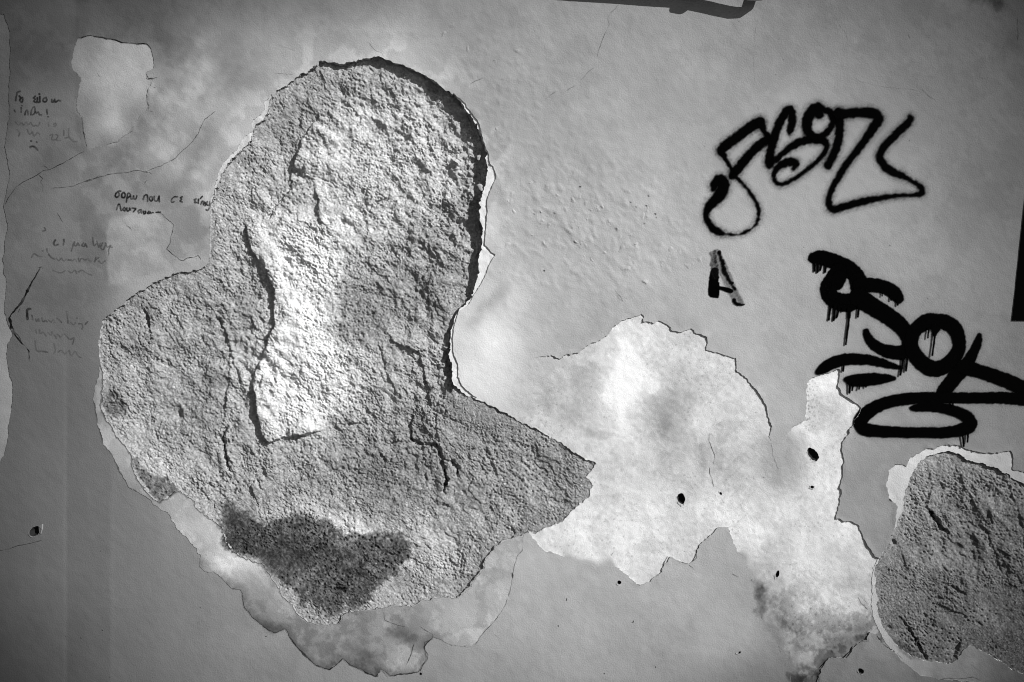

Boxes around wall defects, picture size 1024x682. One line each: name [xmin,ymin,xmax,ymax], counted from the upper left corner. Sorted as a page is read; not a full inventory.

peeling [71,35,154,149]
crack [5,102,87,204]
crack [8,267,41,358]
spalling [93,56,596,677]
crack [411,431,459,488]
peeling [502,314,1024,682]
water stain [222,502,411,616]